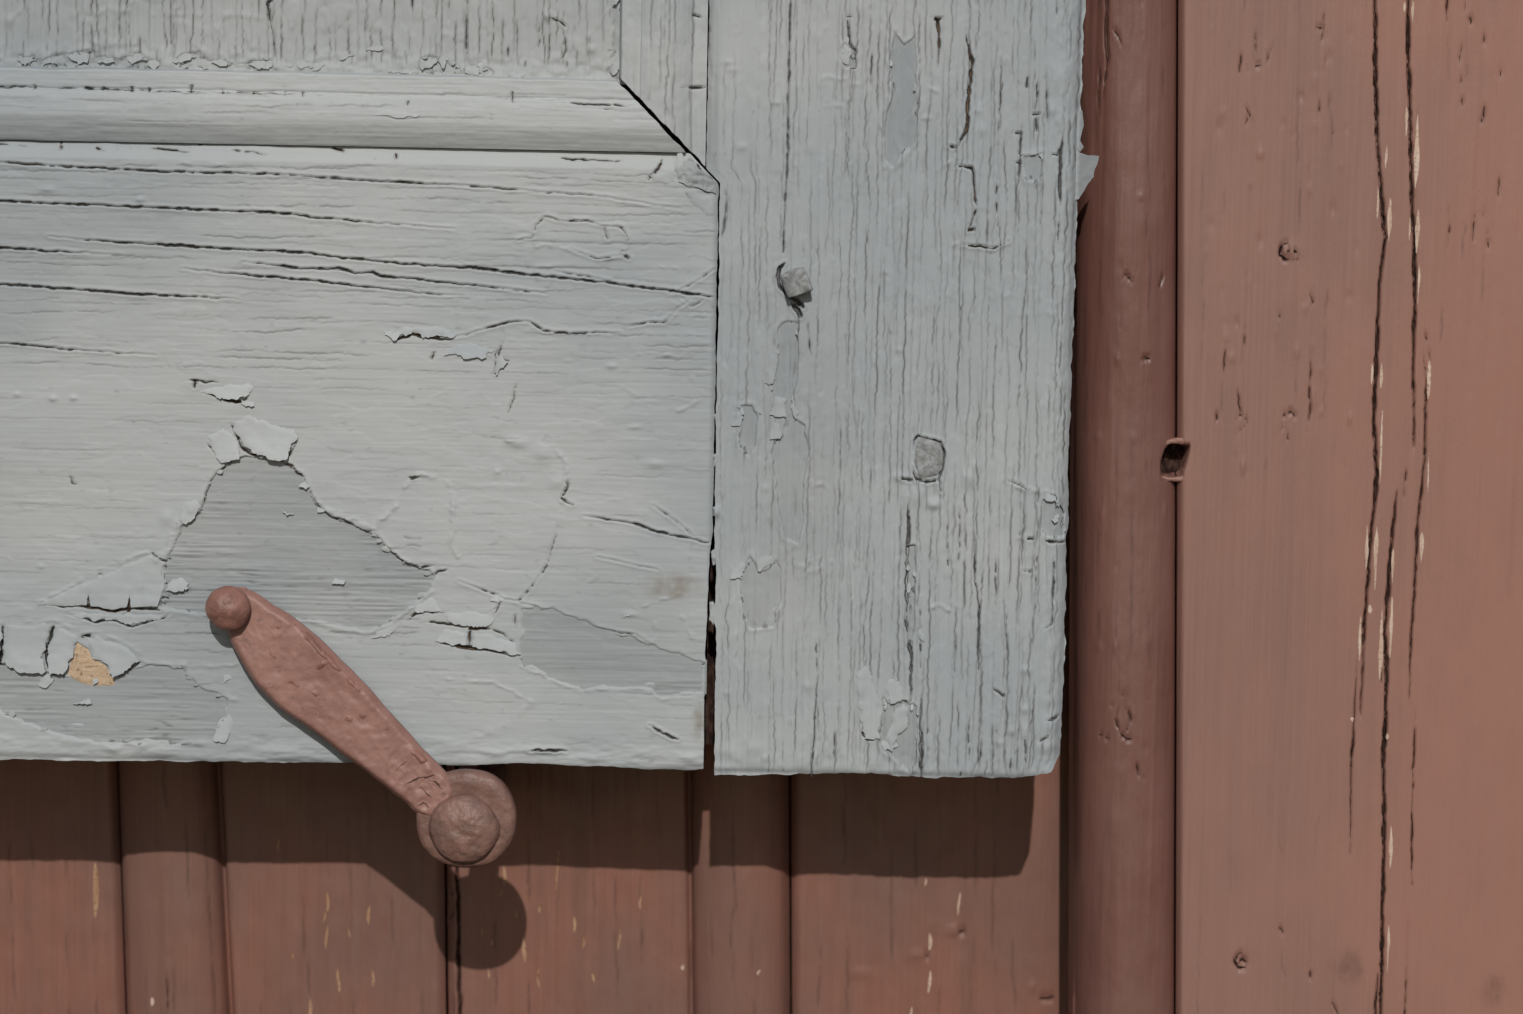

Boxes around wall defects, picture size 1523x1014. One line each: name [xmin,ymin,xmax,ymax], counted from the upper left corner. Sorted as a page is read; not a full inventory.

crack [266,0,276,53]
crack [0,141,710,413]
peeling [384,325,508,375]
crack [409,0,567,60]
crack [777,0,810,348]
crack [841,20,872,82]
crack [934,17,1063,249]
peeling [0,383,707,745]
crack [811,643,873,777]
peeling [855,666,922,772]
crack [901,436,1065,774]
crack [1350,0,1501,1014]